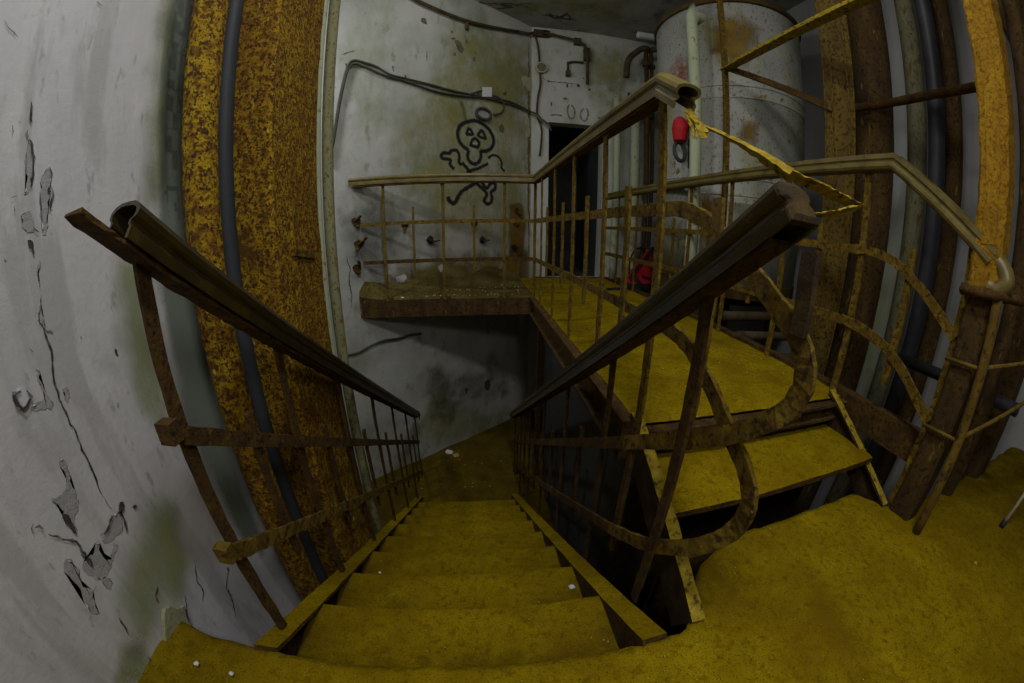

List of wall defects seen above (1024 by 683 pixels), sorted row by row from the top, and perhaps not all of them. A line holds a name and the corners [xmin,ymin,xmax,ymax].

peeling [12,102,54,253]
peeling [30,368,70,411]
crack [29,260,112,509]
peeling [31,458,137,615]